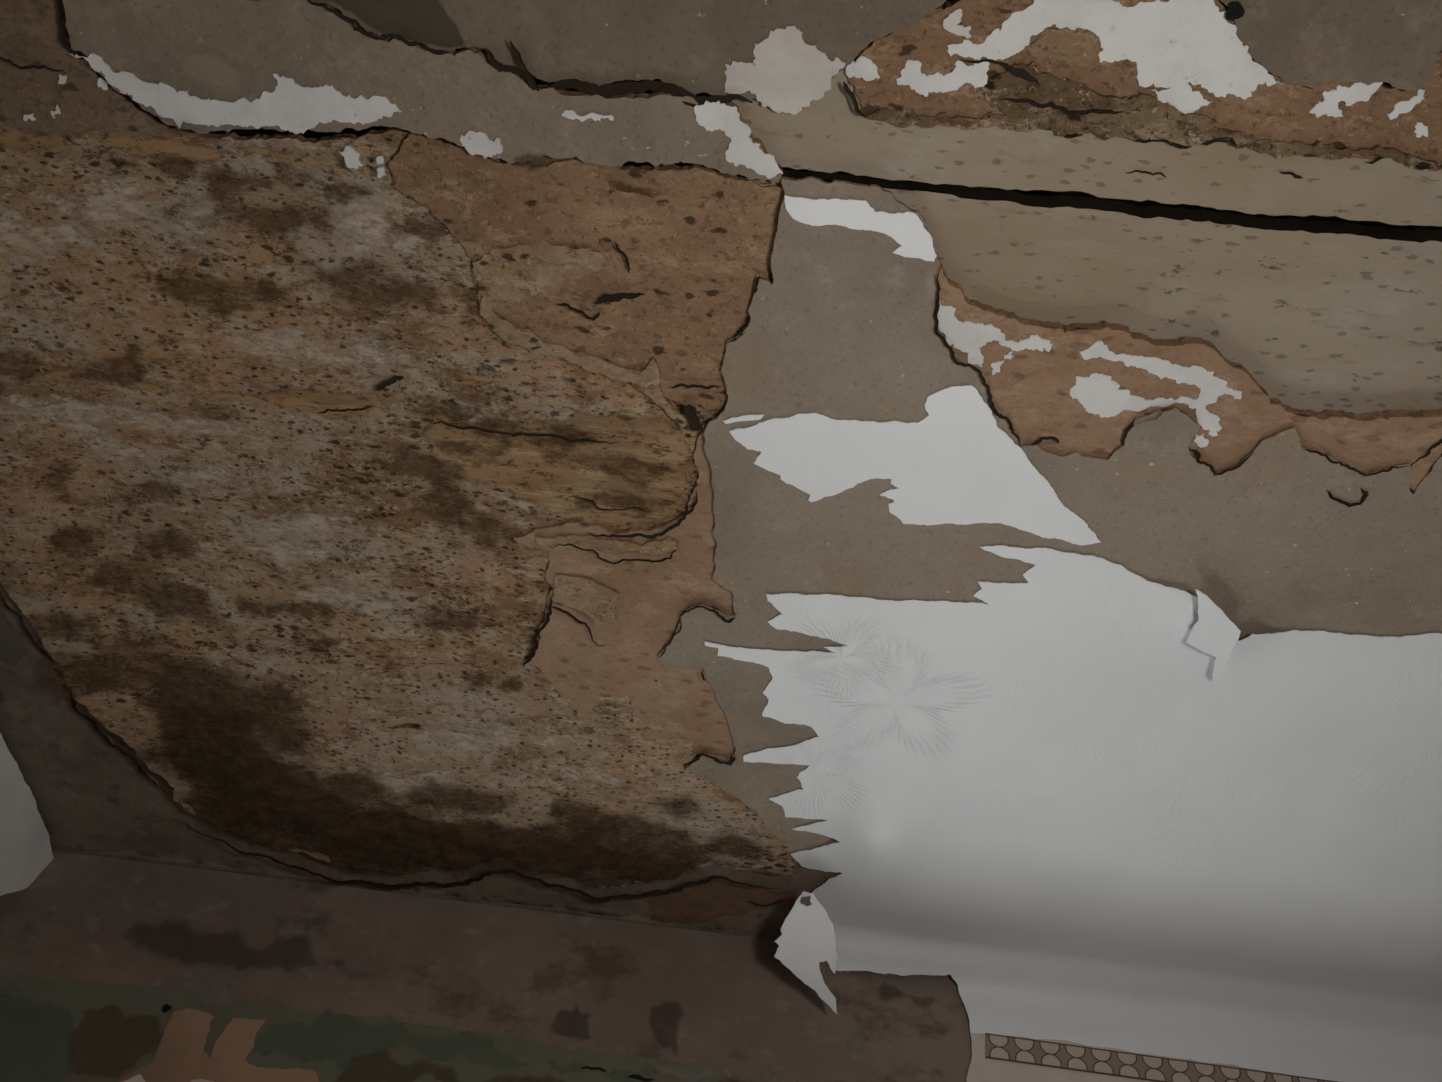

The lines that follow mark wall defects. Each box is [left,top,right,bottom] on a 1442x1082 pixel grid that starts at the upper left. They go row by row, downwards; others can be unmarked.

crack [0,0,82,74]
crack [307,0,753,107]
leakage [0,344,239,460]
flaking render [0,0,1442,761]
leakage [249,514,354,567]
leakage [0,526,789,888]
leakage [70,1006,161,1076]
leakage [338,1051,458,1082]